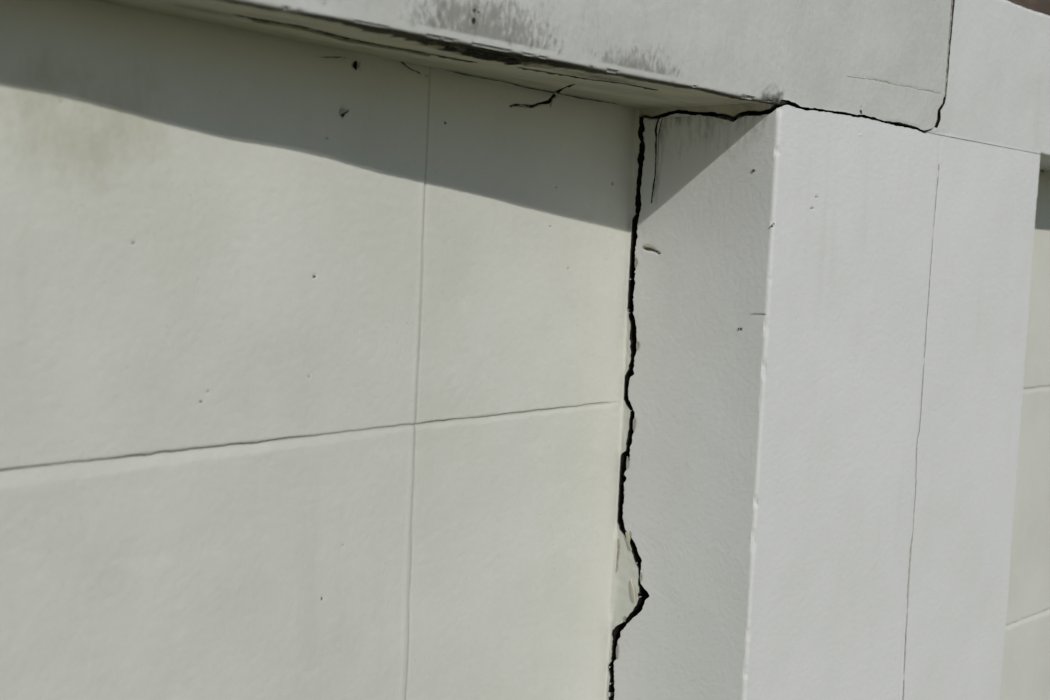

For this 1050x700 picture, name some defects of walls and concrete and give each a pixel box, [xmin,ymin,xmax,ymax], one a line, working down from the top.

crack [446,0,955,700]